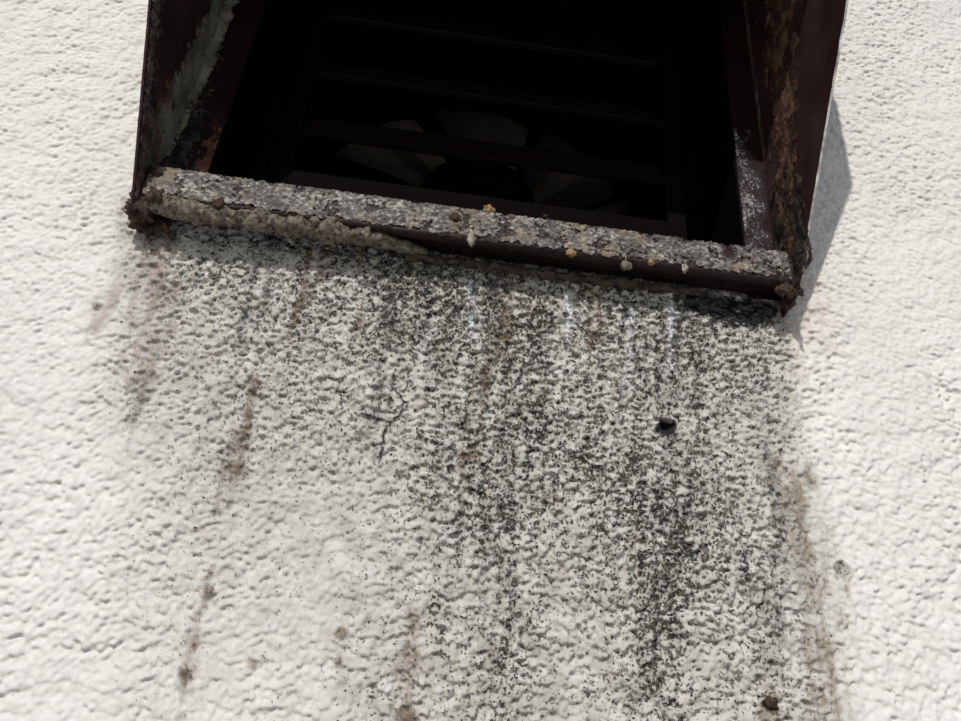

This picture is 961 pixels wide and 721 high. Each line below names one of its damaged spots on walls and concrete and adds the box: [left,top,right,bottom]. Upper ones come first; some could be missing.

rust [135,0,804,279]
rust [179,635,199,700]
rust [216,378,258,510]
crack [361,387,405,465]
leakage [109,209,843,721]
rust [777,460,849,721]